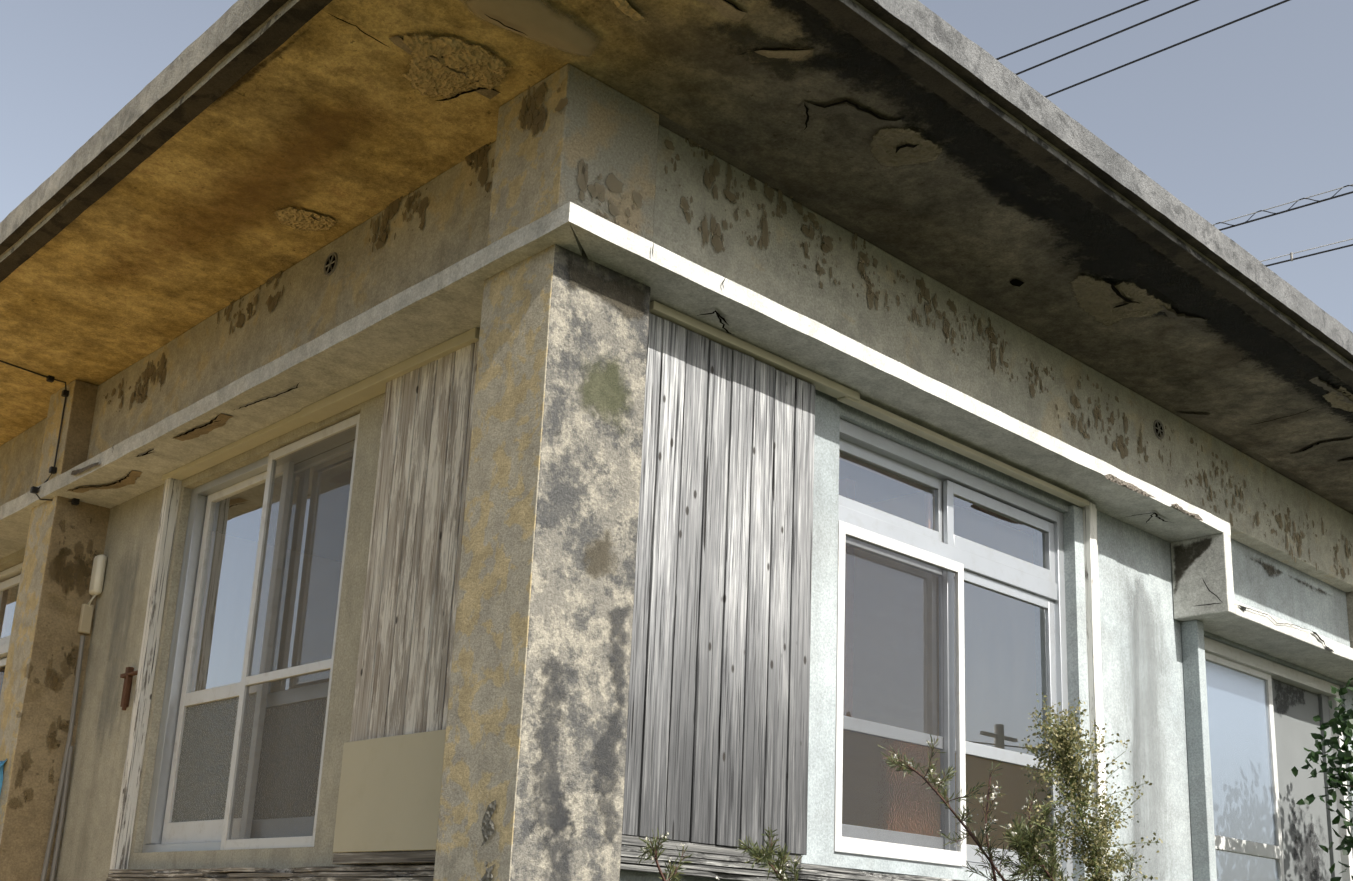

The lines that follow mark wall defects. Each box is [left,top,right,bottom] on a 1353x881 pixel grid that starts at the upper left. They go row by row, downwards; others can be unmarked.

peeling [518,82,568,137]
peeling [369,188,428,252]
peeling [577,159,642,228]
leakage [707,0,1353,426]
peeling [217,271,291,335]
peeling [665,128,1353,579]
leakage [583,361,628,422]
leakage [585,530,617,579]
leakage [594,604,631,841]
leakage [532,657,574,881]